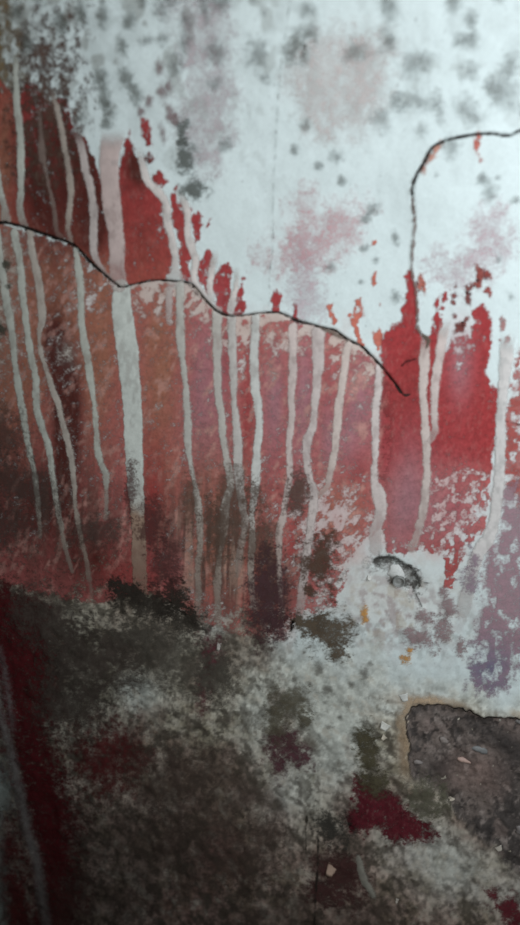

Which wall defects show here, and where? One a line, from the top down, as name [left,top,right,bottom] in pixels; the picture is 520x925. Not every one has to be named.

damp [0,3,359,744]
peeling [140,118,246,315]
crack [0,130,520,397]
peeling [271,289,283,312]
peeling [348,298,383,351]
damp [369,364,388,541]
flaking render [367,556,427,607]
damp [404,331,520,697]
damp [297,809,375,917]
damp [351,724,451,821]
spalling [380,693,520,872]